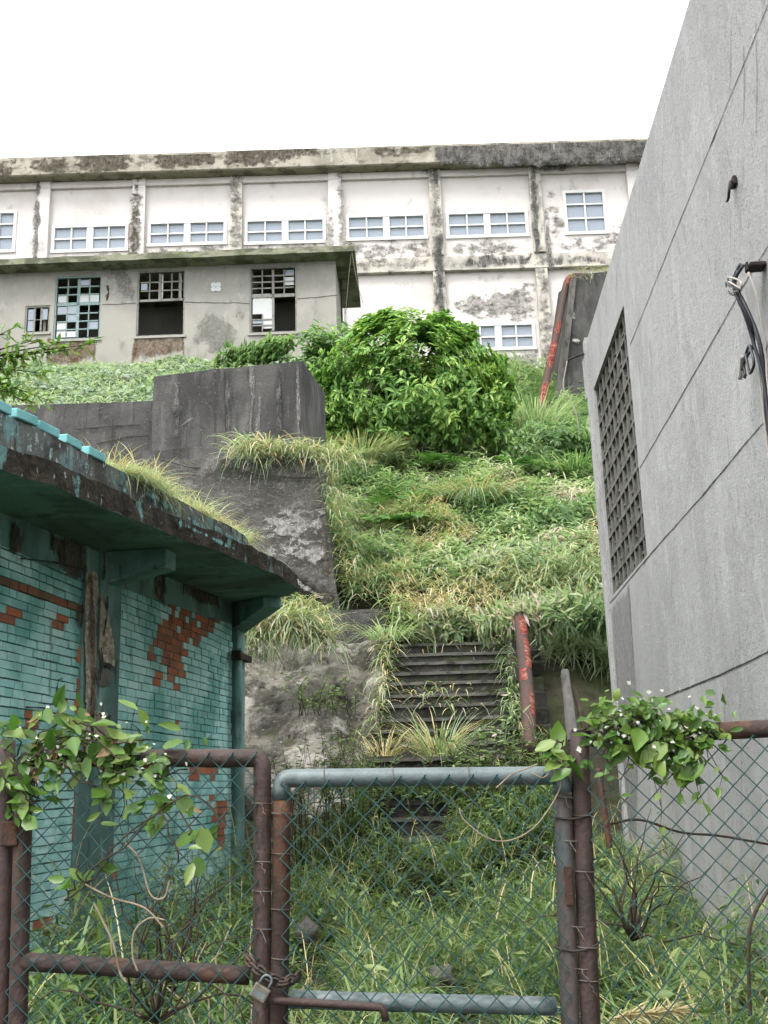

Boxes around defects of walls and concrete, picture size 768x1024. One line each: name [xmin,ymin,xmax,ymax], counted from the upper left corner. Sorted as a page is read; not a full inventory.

water stain [128,178,142,254]
water stain [375,135,647,359]
water stain [195,312,241,353]
peeling [146,492,245,550]
peeling [0,535,115,749]
peeling [147,575,220,691]